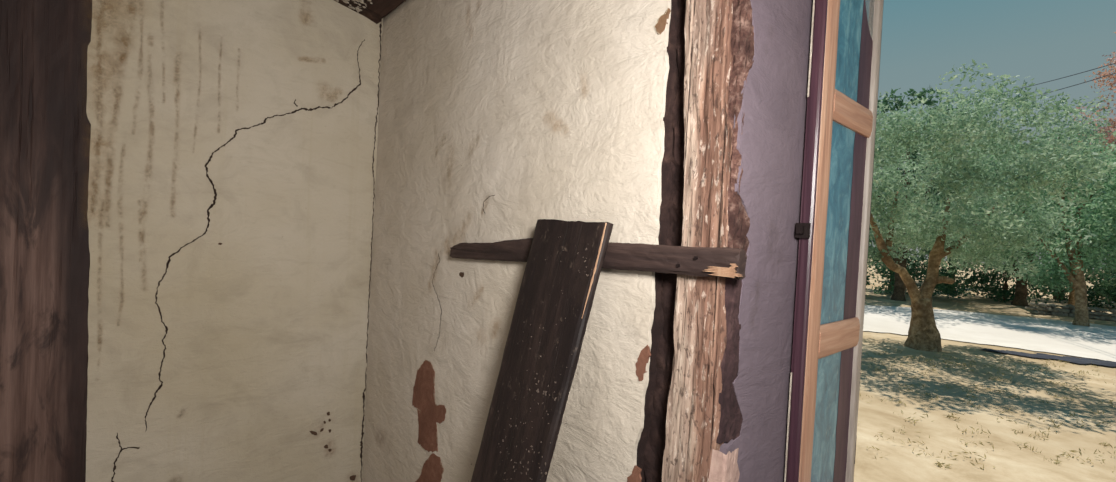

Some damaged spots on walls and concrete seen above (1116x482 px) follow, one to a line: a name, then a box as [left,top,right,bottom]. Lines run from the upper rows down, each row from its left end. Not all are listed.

flaking render [654,8,671,35]
crack [111,19,382,482]
flaking render [636,345,651,381]
flaking render [412,359,446,482]
flaking render [627,465,642,482]